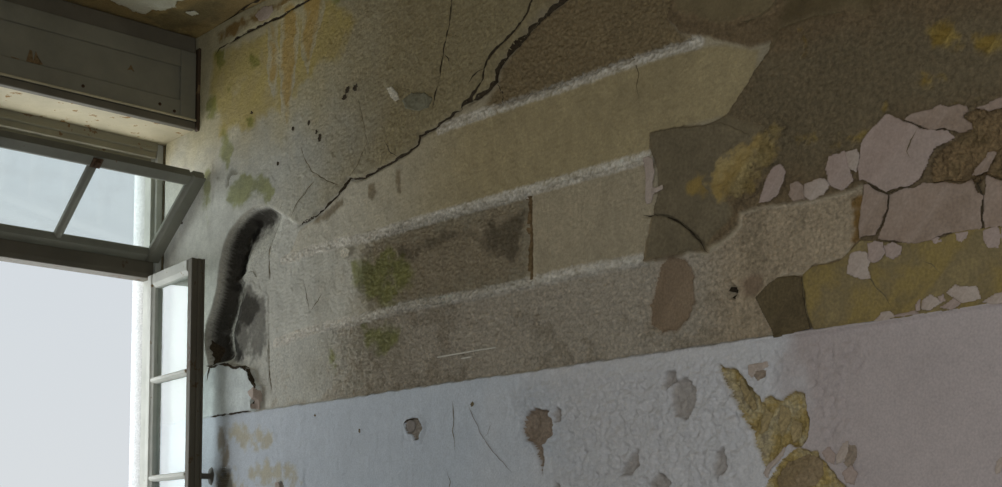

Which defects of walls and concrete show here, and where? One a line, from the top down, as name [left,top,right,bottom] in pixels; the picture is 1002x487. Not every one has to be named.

peeling [111,0,199,16]
crack [269,0,568,274]
spalling [206,0,1002,409]
spalling [403,418,422,440]
spalling [524,408,562,471]
spalling [721,361,858,487]